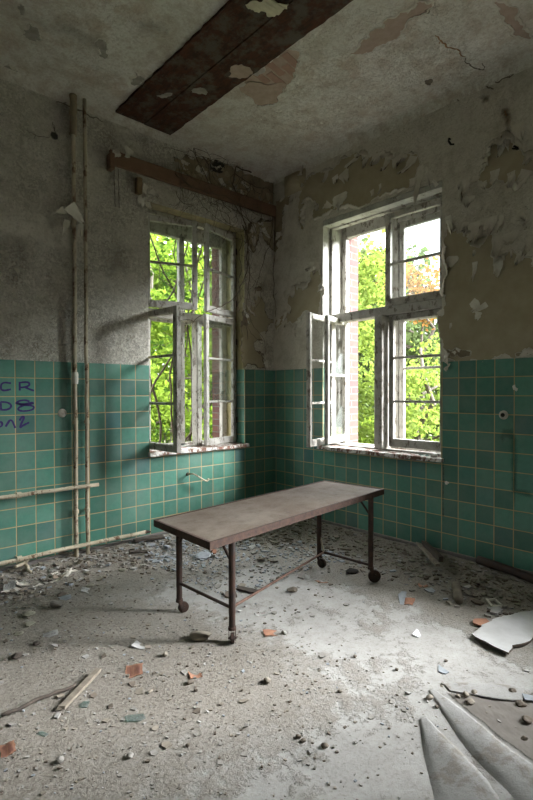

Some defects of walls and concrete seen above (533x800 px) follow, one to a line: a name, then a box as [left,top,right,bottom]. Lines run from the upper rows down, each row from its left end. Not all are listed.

flaking render [229,47,300,107]
peeling [347,0,435,57]
crack [435,35,514,90]
peeling [492,0,533,40]
peeling [173,149,439,253]
peeling [455,121,533,207]
peeling [274,262,325,337]
peeling [437,211,533,372]